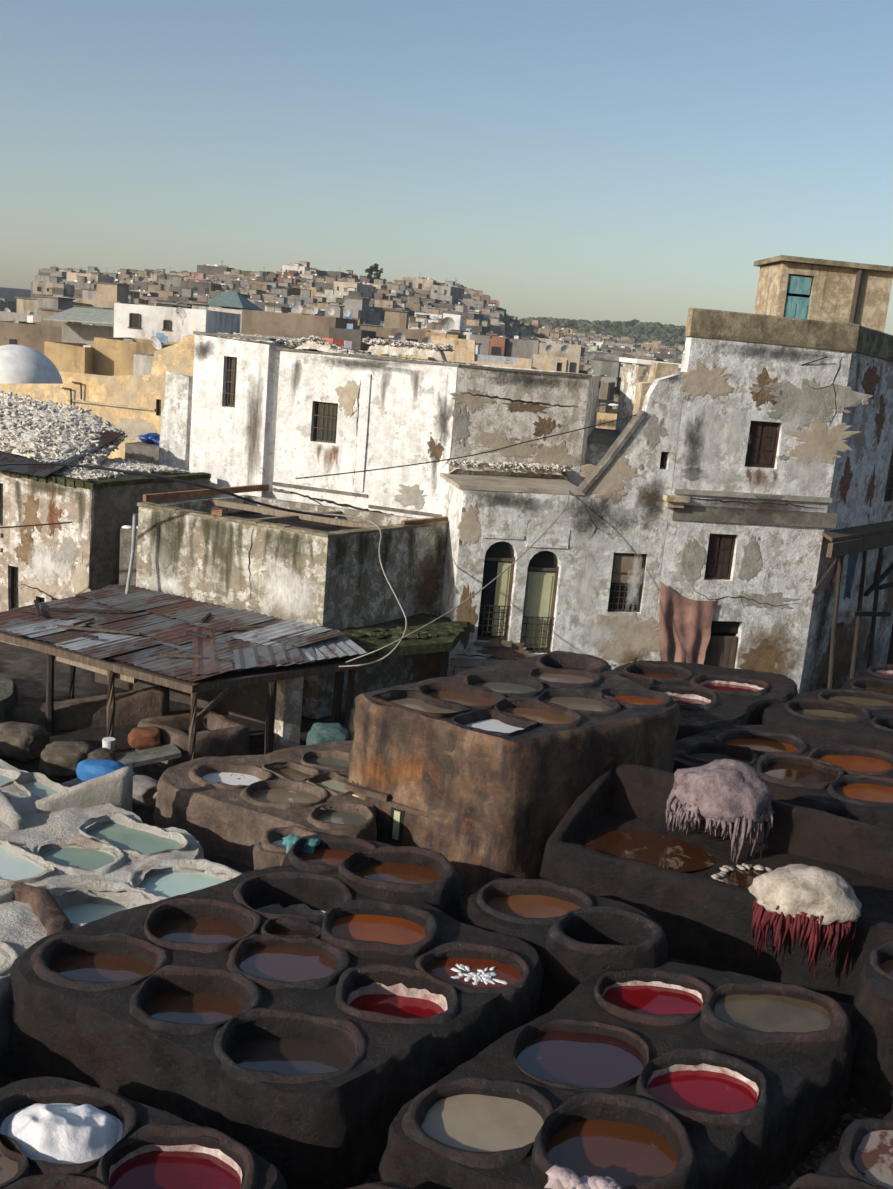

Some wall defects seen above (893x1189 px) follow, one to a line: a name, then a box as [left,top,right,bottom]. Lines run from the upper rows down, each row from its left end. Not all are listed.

flaking render [335,380,360,418]
crack [460,392,577,407]
water stain [247,386,259,475]
flaking render [427,388,643,503]
flaking render [642,414,668,452]
flaking render [680,359,893,505]
flaking render [394,484,427,511]
spalling [865,467,876,519]
flaking render [13,492,91,596]
water stain [151,513,241,576]
water stain [265,531,312,561]